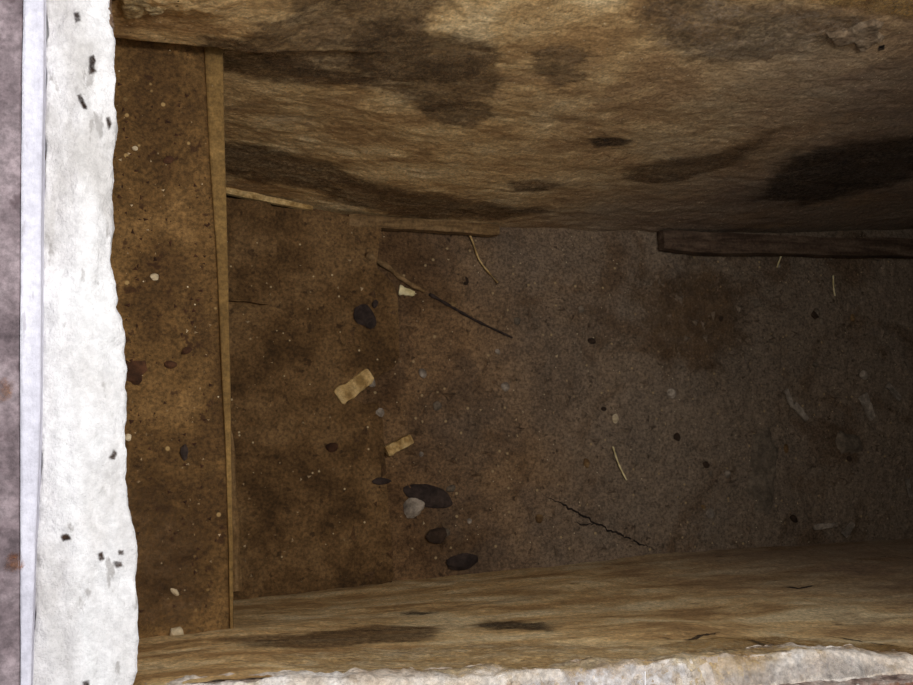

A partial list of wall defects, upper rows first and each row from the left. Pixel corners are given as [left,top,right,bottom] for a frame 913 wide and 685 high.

leakage [201,0,500,126]
leakage [644,0,858,60]
leakage [762,138,913,205]